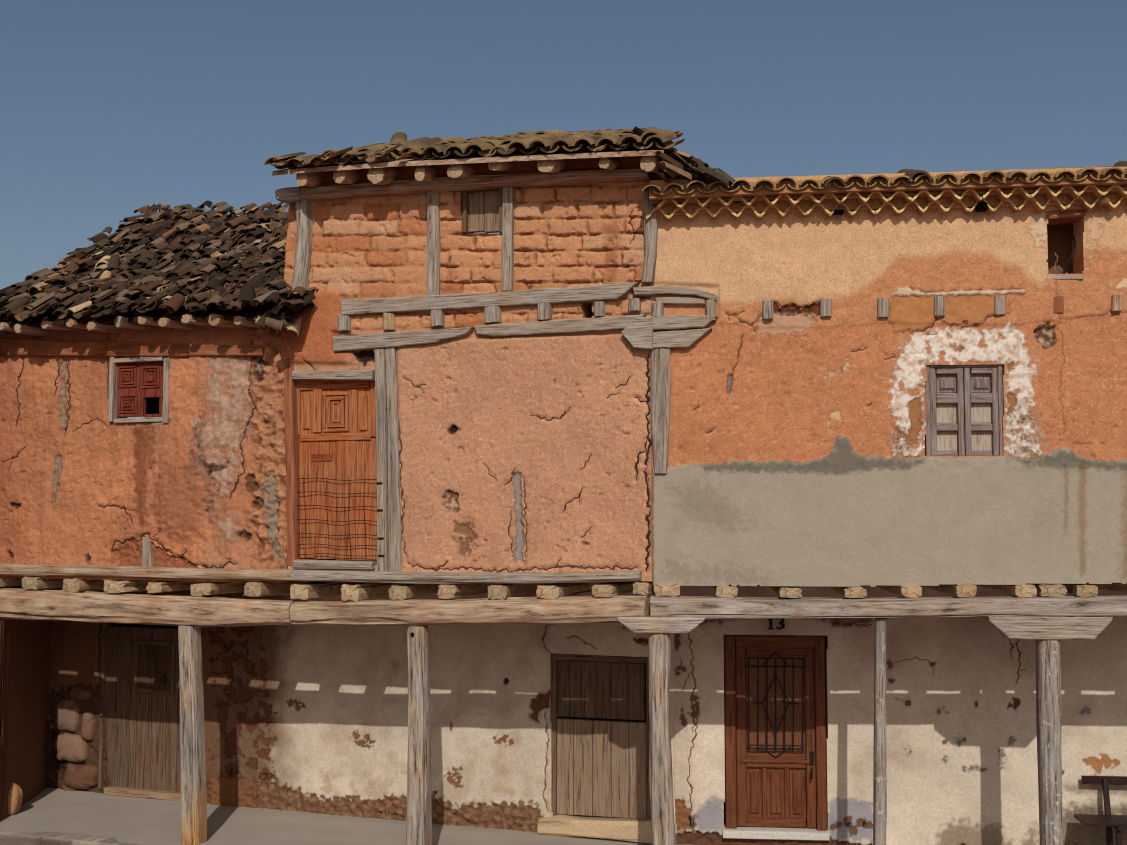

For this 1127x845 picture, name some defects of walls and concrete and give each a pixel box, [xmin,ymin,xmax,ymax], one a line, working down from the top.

peeling [187,356,285,560]
crack [399,354,652,573]
crack [909,287,1026,335]
peeling [888,322,1049,460]
crack [1034,253,1127,438]
crack [101,504,237,568]
spalling [206,626,407,821]
spalling [431,791,543,833]
crack [680,633,699,810]
spalling [675,799,873,845]
crack [1009,639,1026,684]
peeling [1083,754,1120,775]